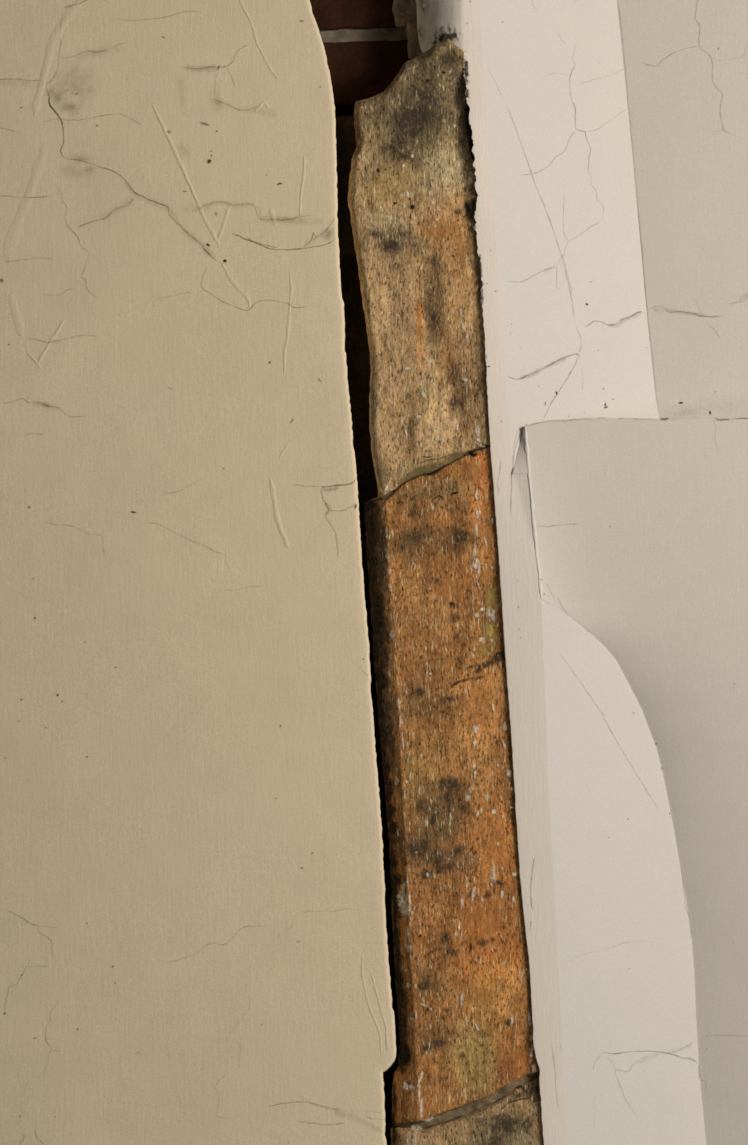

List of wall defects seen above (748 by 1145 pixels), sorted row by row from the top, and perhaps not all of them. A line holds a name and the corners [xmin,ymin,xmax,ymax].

peeling [473,508,493,588]
peeling [397,877,421,988]
peeling [403,1072,434,1142]